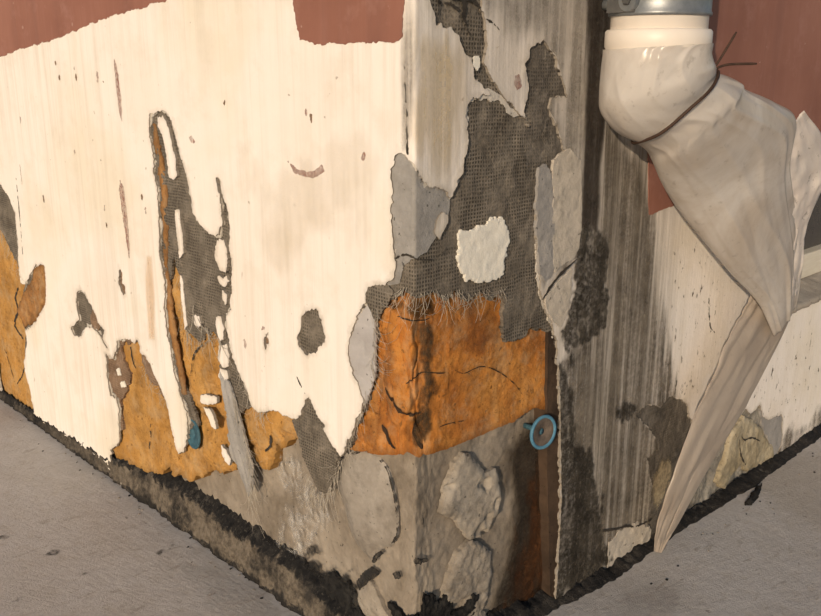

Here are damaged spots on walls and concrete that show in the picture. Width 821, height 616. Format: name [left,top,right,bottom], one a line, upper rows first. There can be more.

peeling [0,185,46,410]
peeling [72,291,105,343]
spalling [107,0,566,616]
leakage [505,0,694,600]
leakage [290,516,335,579]
leakage [341,575,364,614]
leakage [494,423,542,612]
peeling [637,397,691,535]
spalling [685,407,782,512]